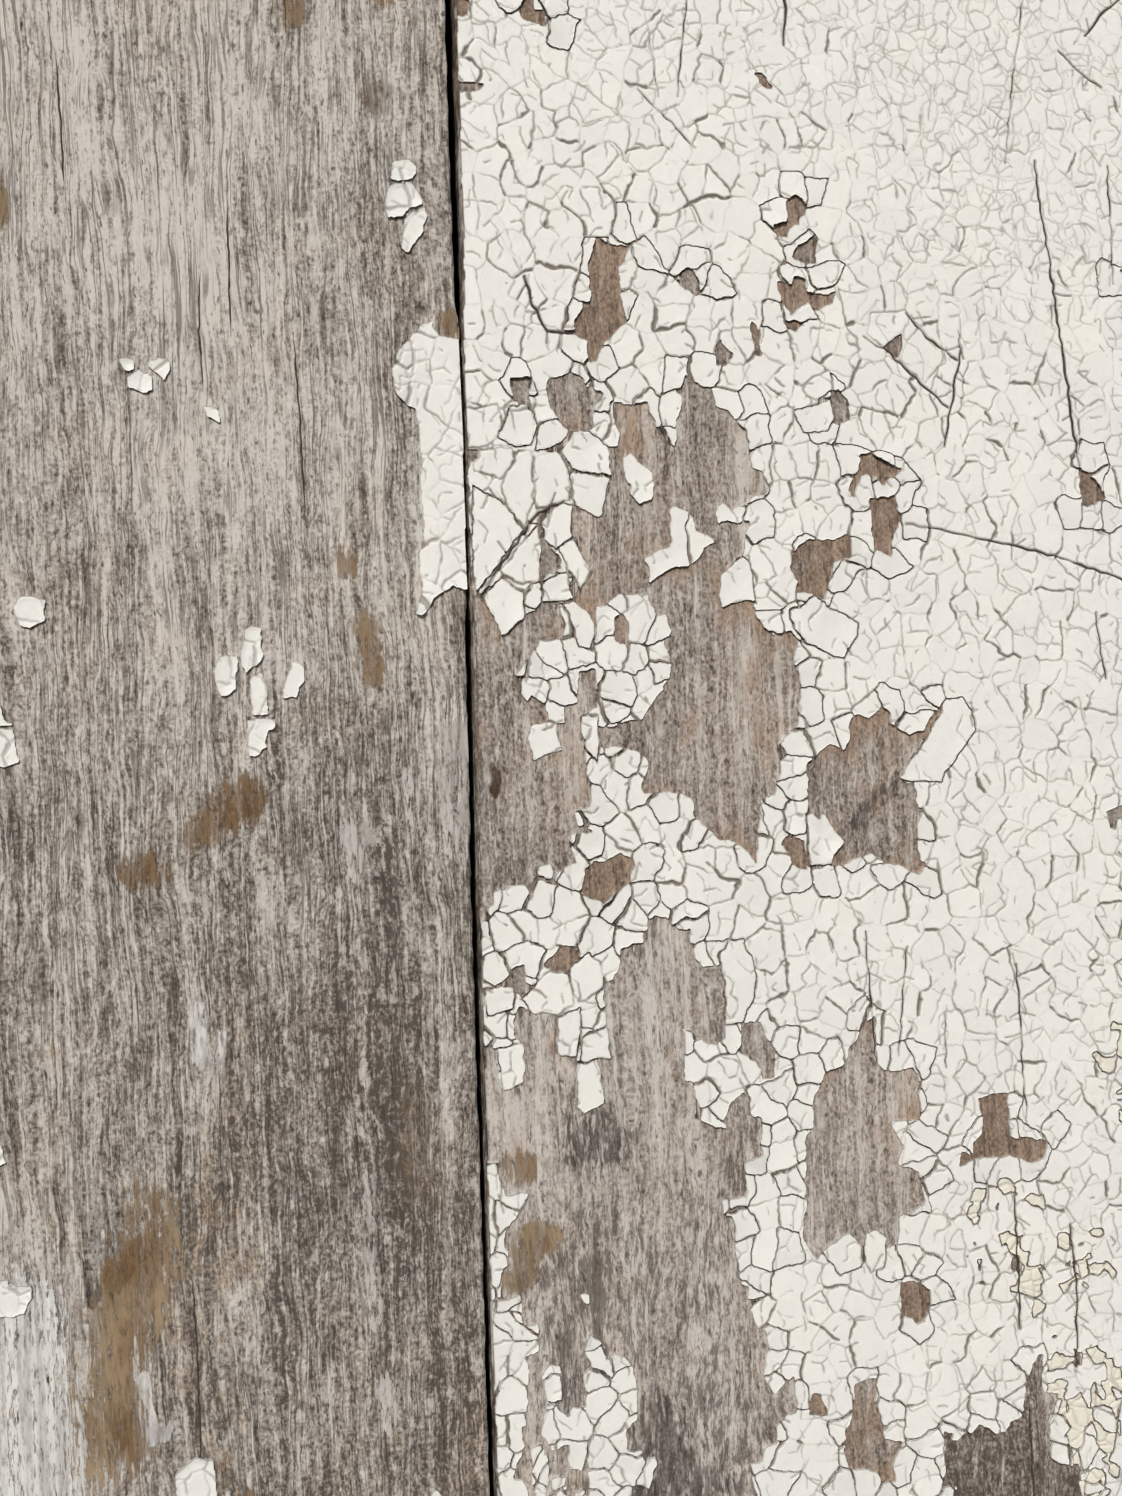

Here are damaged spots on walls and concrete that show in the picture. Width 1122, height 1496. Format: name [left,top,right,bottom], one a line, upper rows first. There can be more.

peeling [385,159,427,252]
crack [519,277,572,334]
peeling [750,171,844,356]
crack [1006,8,1082,452]
crack [863,314,964,447]
peeling [13,596,46,628]
crack [481,495,564,596]
crack [928,527,1122,580]
peeling [214,625,304,756]
peeling [392,202,1122,1496]
crack [1070,1228,1078,1367]
peeling [175,1457,217,1496]